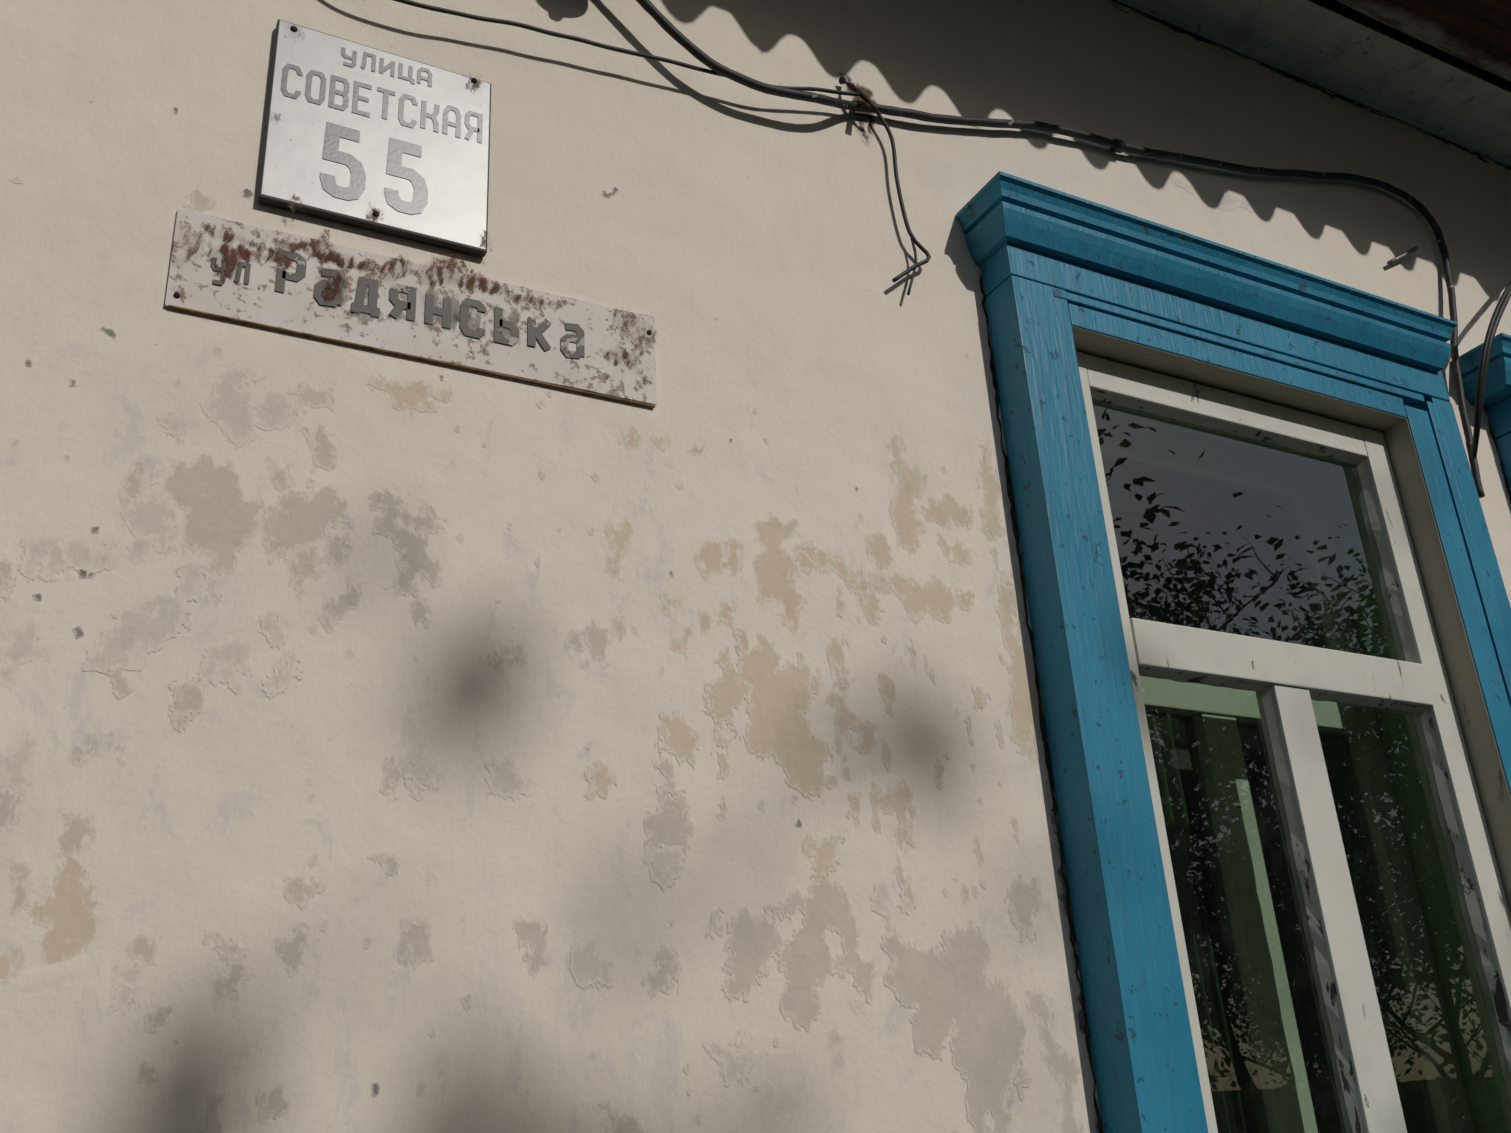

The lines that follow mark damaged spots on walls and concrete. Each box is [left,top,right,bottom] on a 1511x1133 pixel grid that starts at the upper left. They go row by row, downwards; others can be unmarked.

peeling [0,806,104,983]
peeling [642,432,1104,1133]